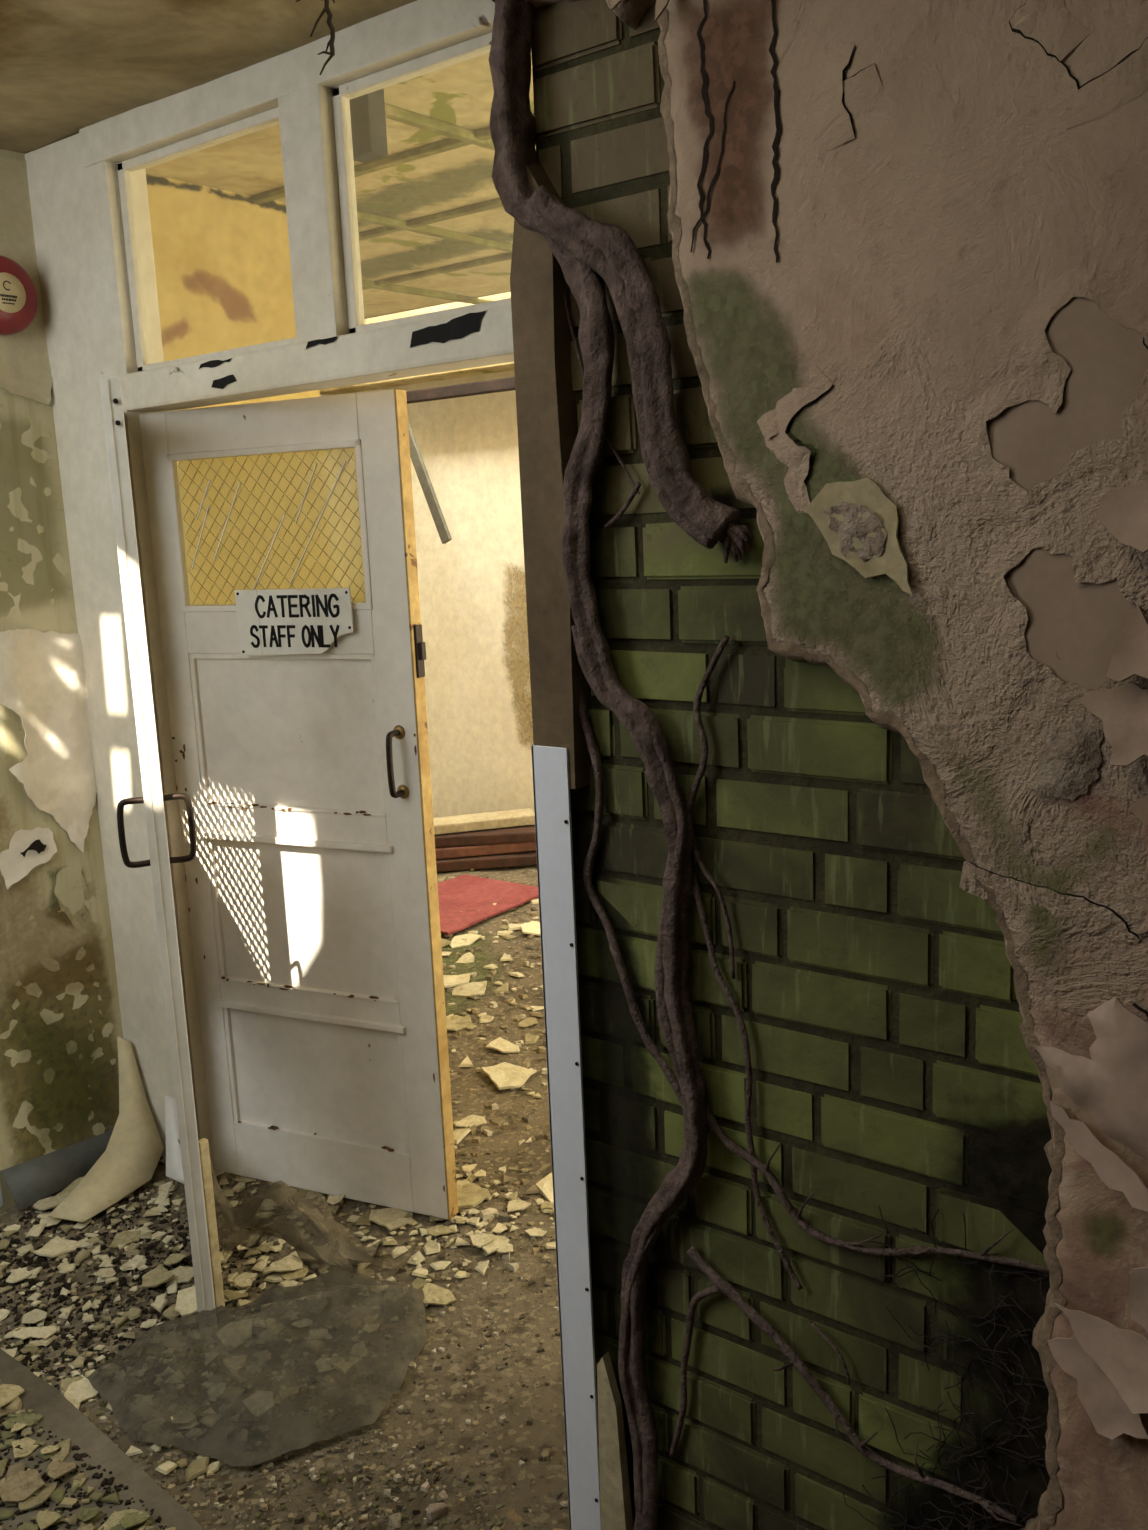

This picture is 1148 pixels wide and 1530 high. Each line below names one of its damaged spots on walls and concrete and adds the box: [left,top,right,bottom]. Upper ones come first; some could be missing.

damp [711,490,752,563]
peeling [0,629,97,890]
flaking render [531,0,1148,1530]
damp [0,943,119,1164]